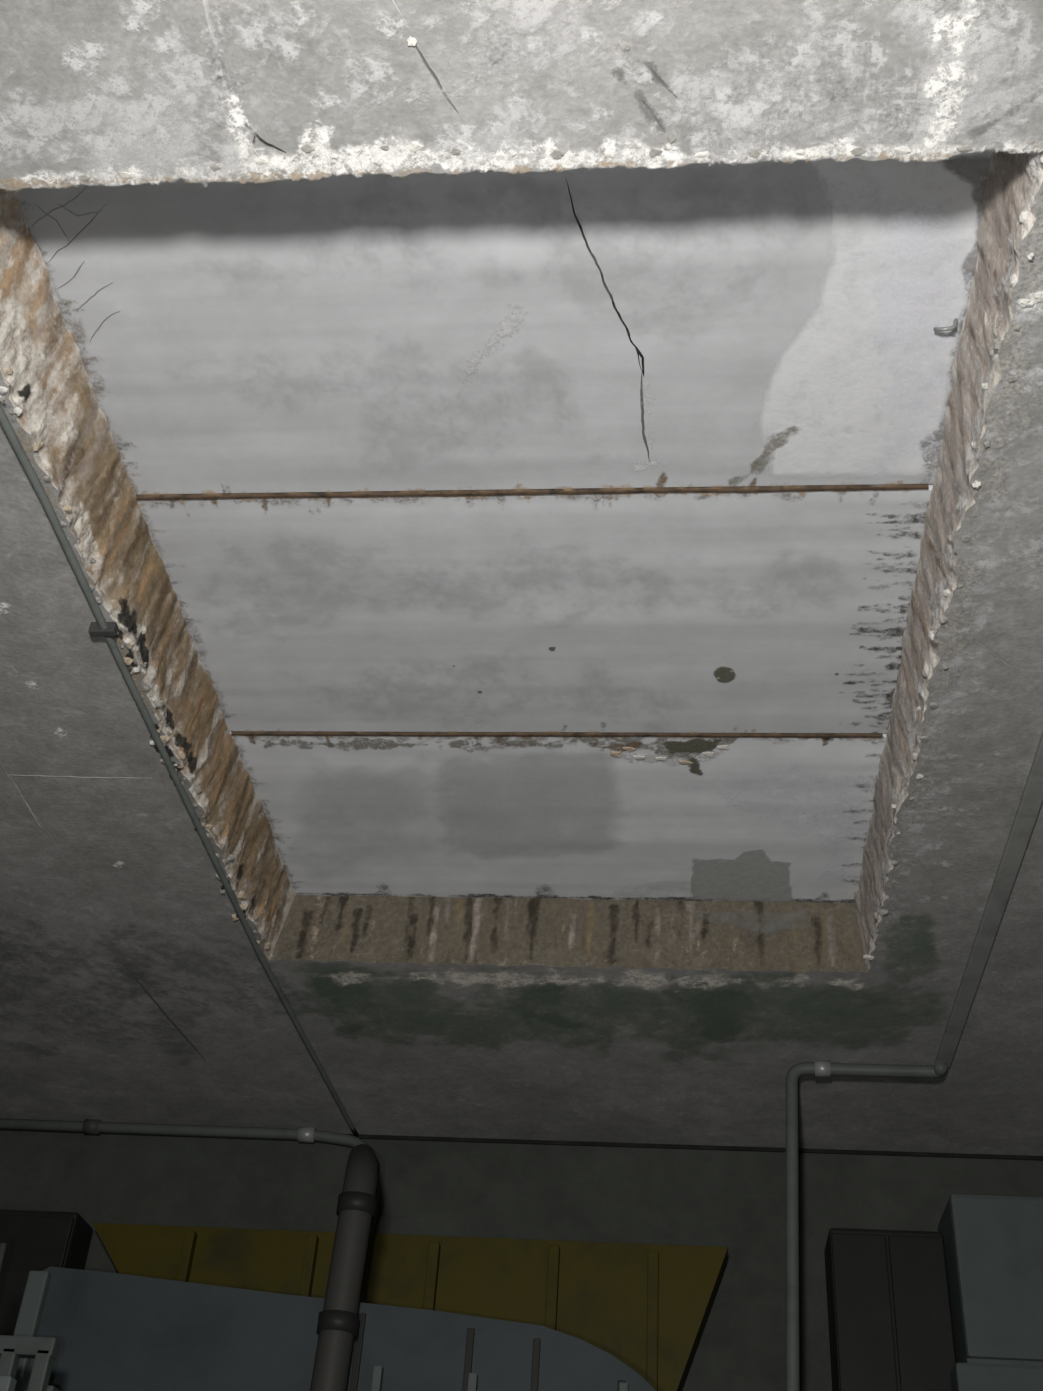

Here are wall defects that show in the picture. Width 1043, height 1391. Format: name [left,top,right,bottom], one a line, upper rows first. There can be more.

crack [565,176,657,471]
spalling [0,384,31,416]
water stain [0,0,1043,978]
corrosion [0,141,1034,957]
spalling [113,599,149,674]
spalling [150,707,197,789]
peeling [265,738,415,749]
peeling [492,737,737,775]
spalling [215,863,255,921]
water stain [324,972,370,1012]
water stain [410,969,808,1020]
water stain [829,979,863,990]